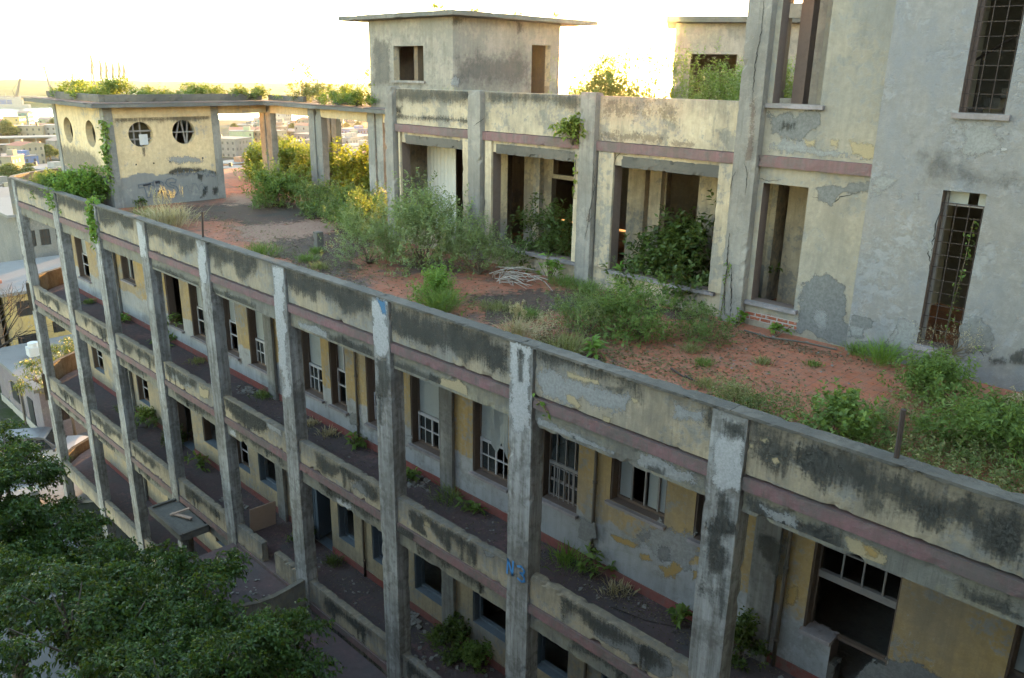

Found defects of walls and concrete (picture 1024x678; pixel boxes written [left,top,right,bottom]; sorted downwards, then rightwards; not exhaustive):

crack [752,1,764,101]
water stain [460,56,578,108]
peeling [767,110,821,147]
peeling [816,181,870,207]
water stain [146,223,257,279]
water stain [390,304,524,384]
water stain [538,352,642,397]
water stain [702,407,1024,580]
peeling [611,534,697,579]
water stain [699,493,735,617]
water stain [961,583,1019,620]